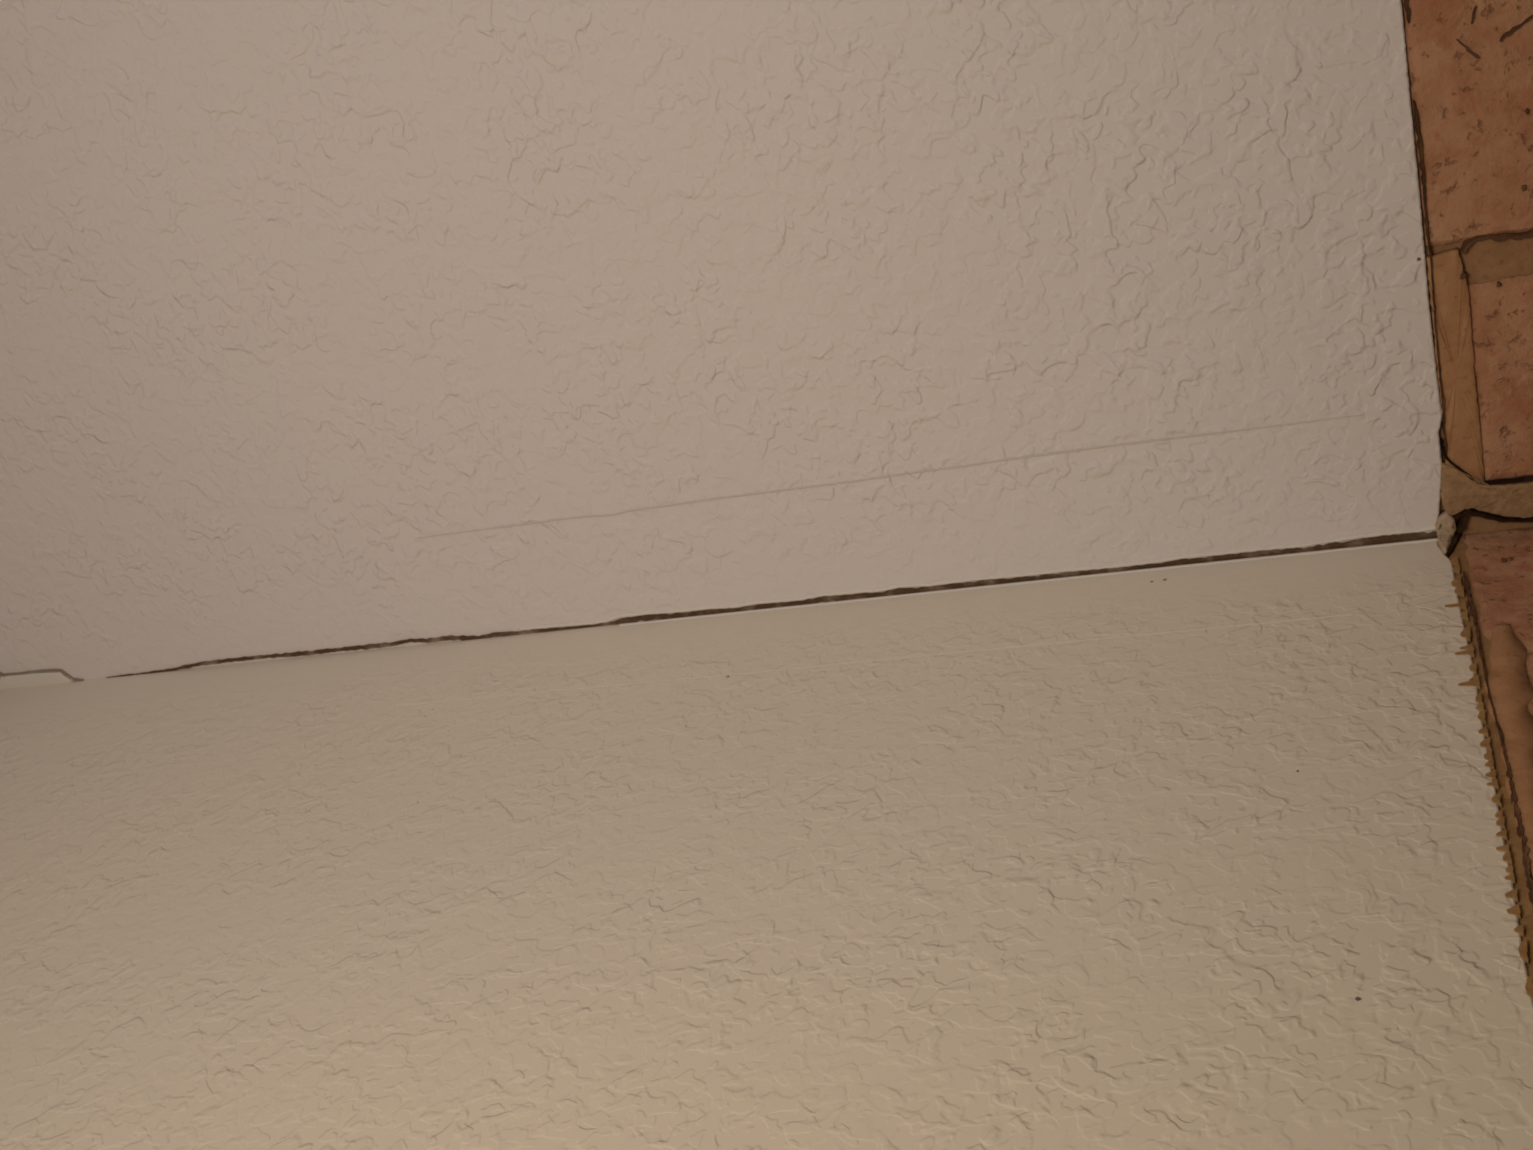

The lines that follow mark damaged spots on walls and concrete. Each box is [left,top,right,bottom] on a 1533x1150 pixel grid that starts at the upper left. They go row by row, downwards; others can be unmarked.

crack [106,100,1533,905]